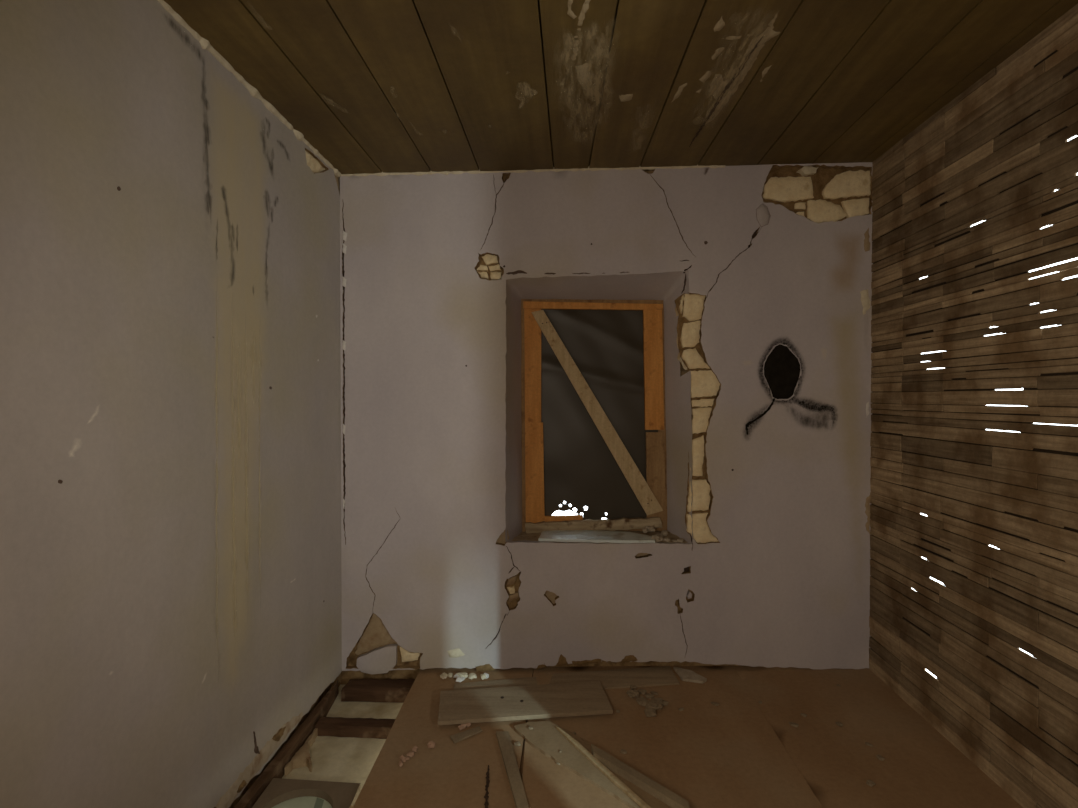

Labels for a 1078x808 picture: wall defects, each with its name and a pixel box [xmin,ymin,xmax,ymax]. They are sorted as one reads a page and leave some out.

peeling [560,0,633,140]
peeling [672,12,780,125]
crack [481,177,507,249]
crack [647,172,758,302]
flaking render [761,166,871,223]
damp [199,49,278,717]
flaking render [674,293,720,543]
spalling [348,613,422,674]
spalling [505,572,521,609]